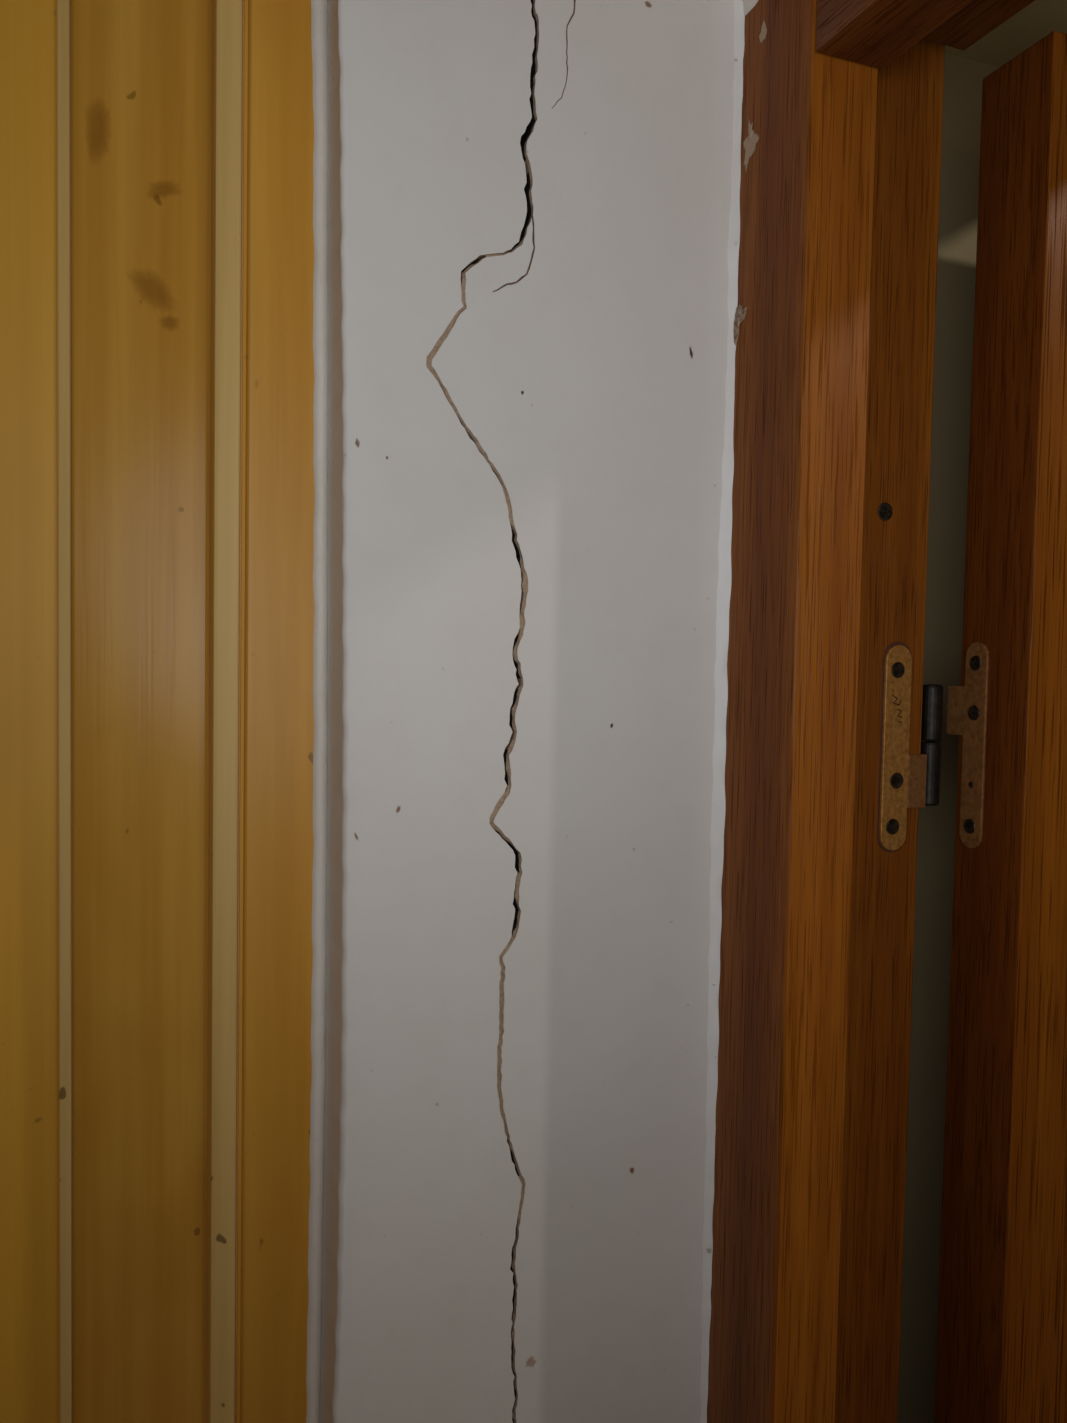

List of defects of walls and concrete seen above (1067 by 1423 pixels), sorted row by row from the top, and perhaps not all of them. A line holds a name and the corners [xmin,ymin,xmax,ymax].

crack [426,0,576,1423]